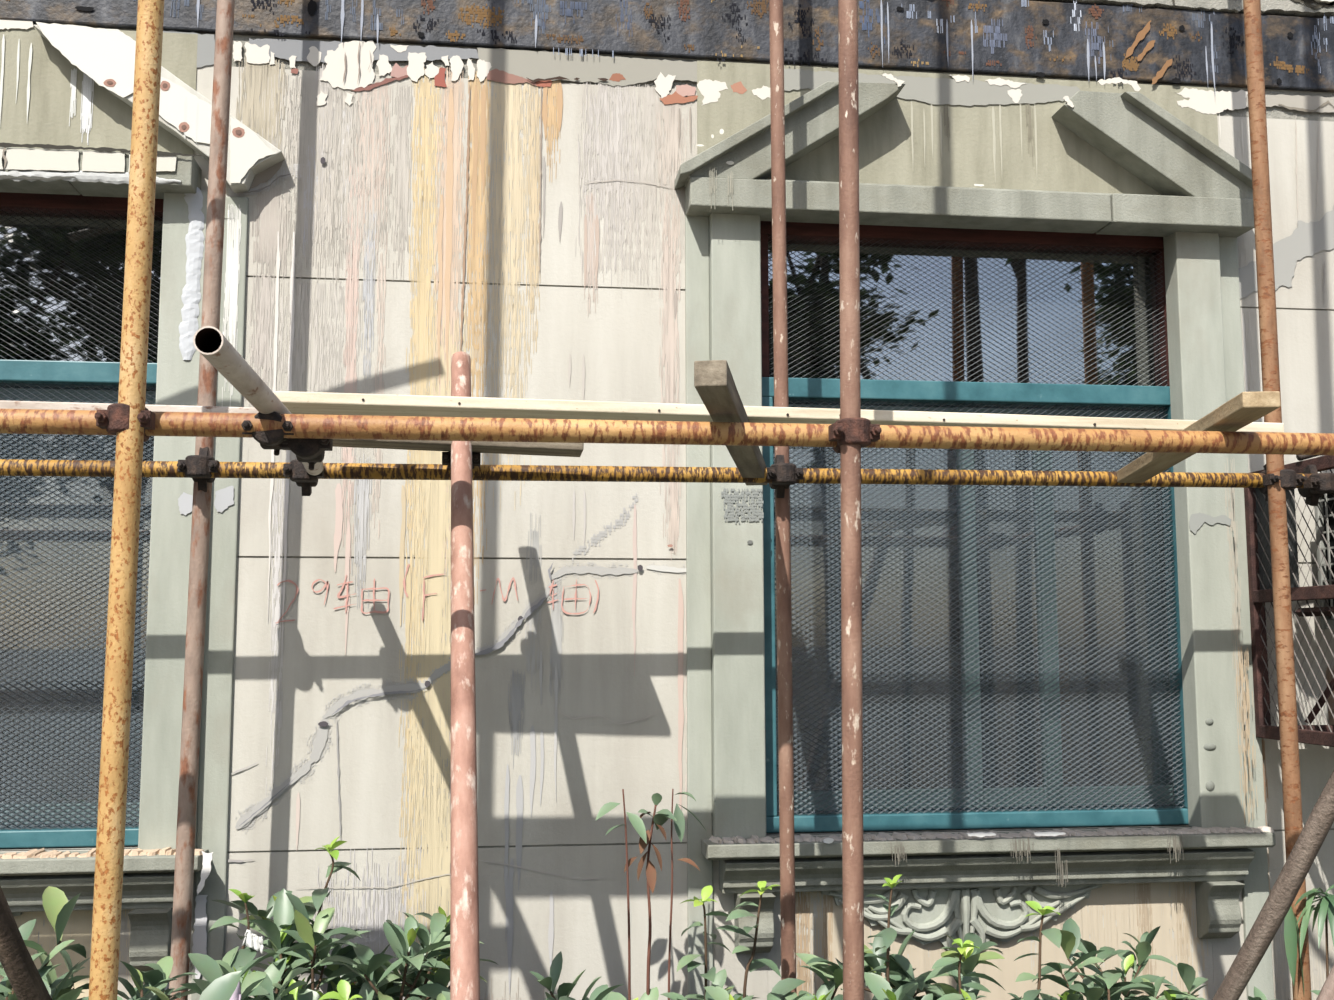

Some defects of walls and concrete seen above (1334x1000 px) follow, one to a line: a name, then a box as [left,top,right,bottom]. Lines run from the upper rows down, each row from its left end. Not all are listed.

corrosion [1122,20,1202,71]
spalling [233,38,839,106]
corrosion [1152,59,1172,84]
spalling [858,73,1080,108]
peeling [1177,87,1248,115]
spalling [1265,94,1334,113]
crack [332,687,426,839]